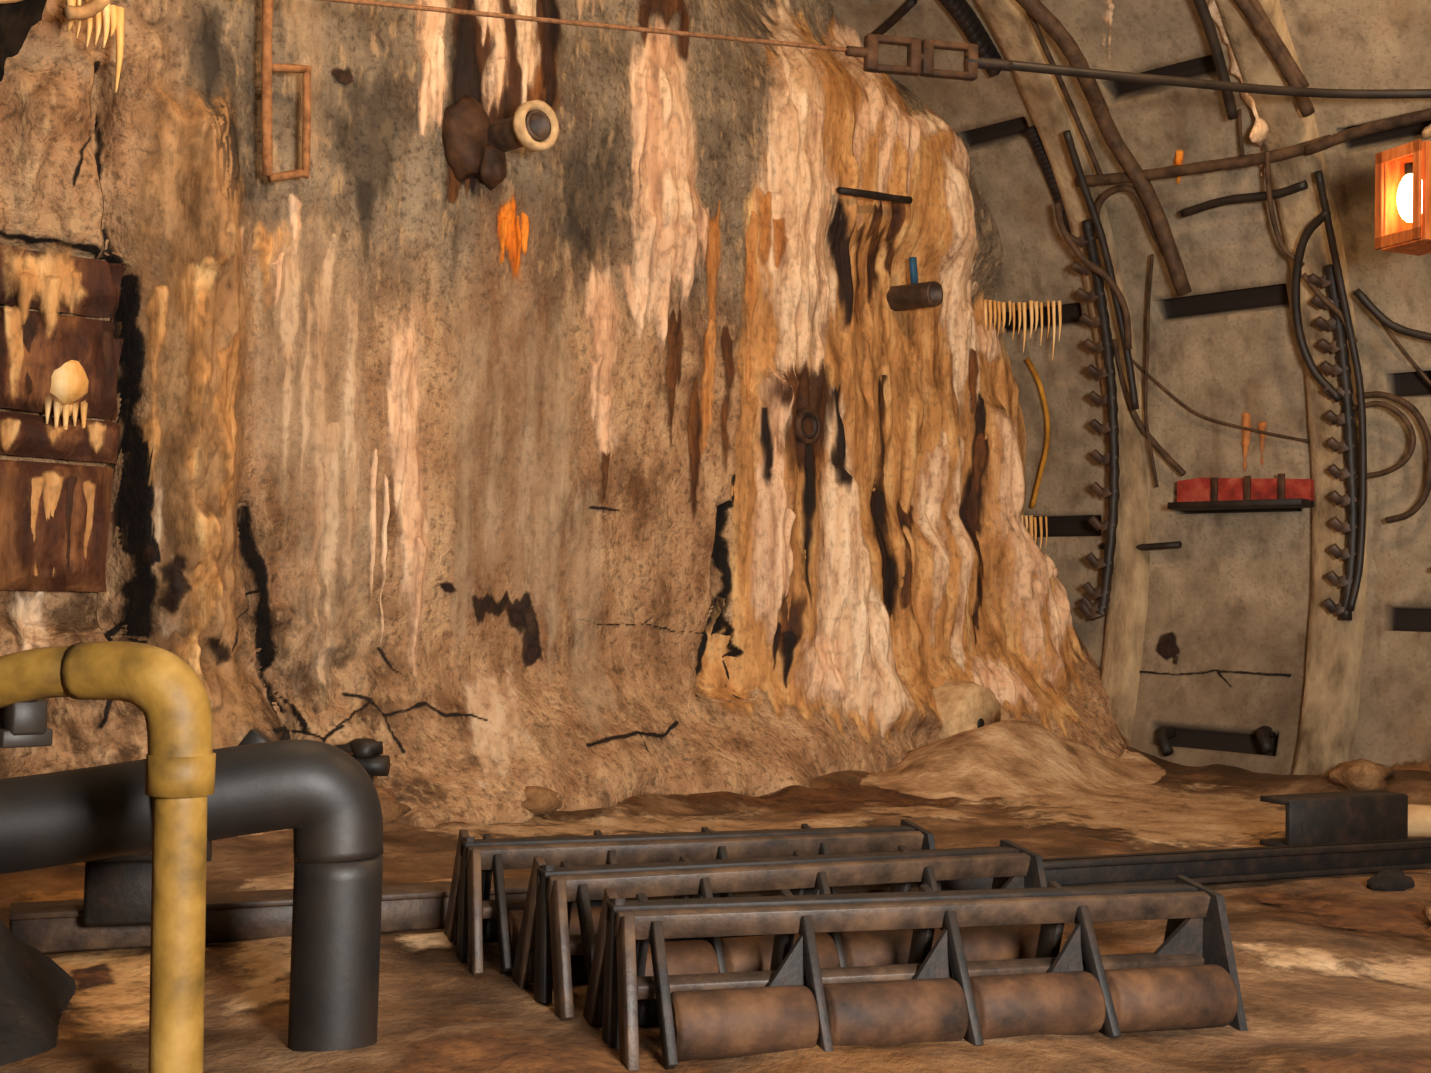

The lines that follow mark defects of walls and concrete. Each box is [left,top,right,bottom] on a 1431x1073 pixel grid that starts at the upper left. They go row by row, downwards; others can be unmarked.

leakage [417,0,447,136]
leakage [476,0,540,108]
corrosion [827,200,906,326]
corrosion [870,375,913,617]
corrosion [959,349,989,644]
crack [232,506,487,753]
spalling [441,582,455,592]
spalling [473,591,542,666]
crack [578,474,744,752]